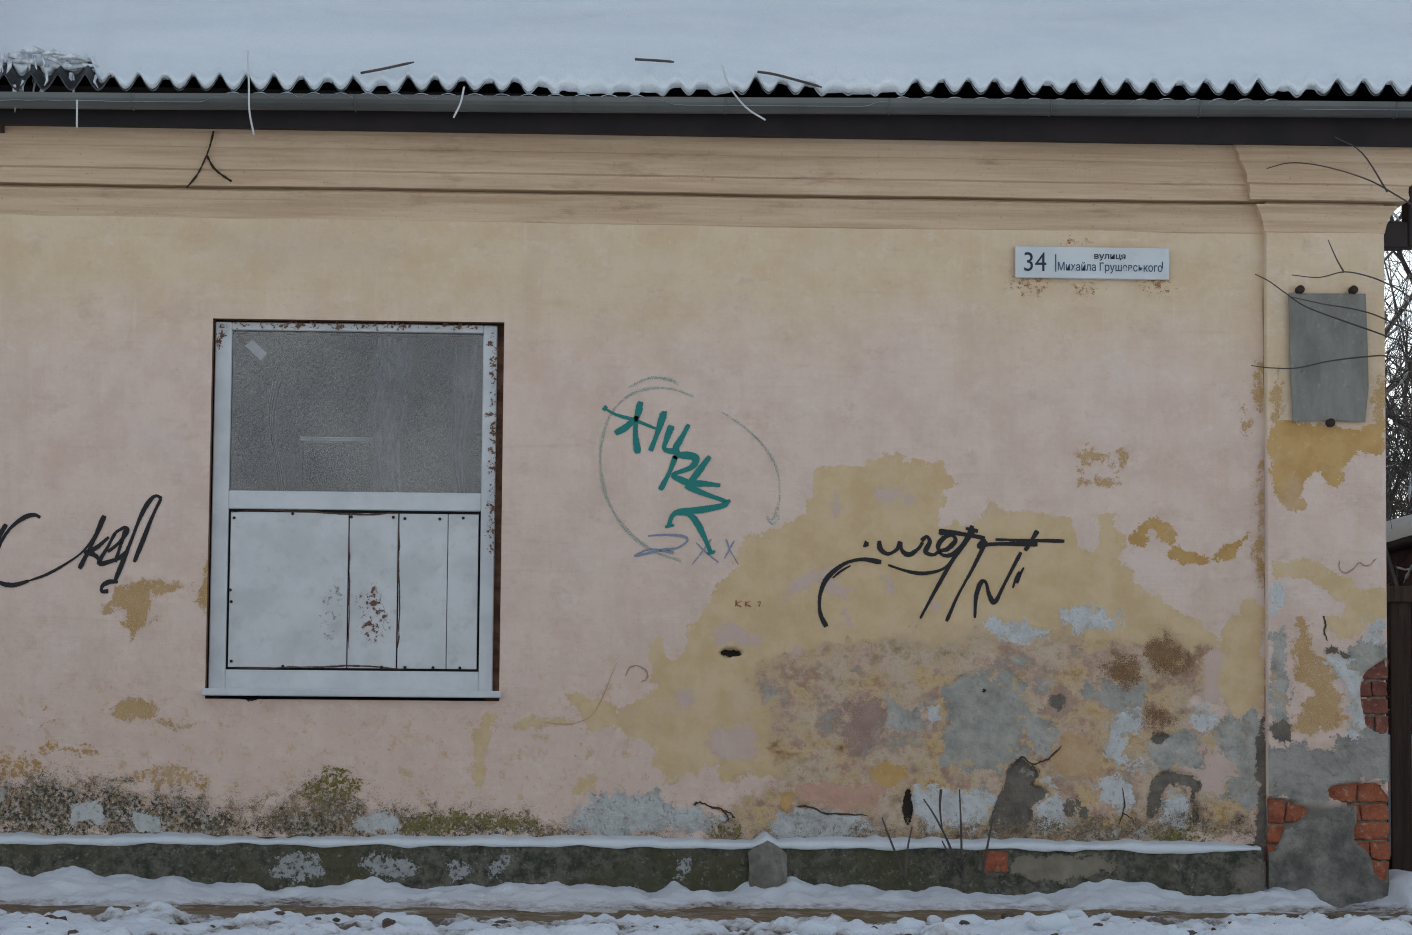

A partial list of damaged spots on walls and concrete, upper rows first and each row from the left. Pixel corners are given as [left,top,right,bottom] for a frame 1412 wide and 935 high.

peeling [1073,442,1129,493]
peeling [1231,360,1386,513]
peeling [99,567,195,653]
corrosion [231,509,400,648]
peeling [110,694,196,732]
peeling [471,451,1391,908]
leakage [0,749,1264,844]